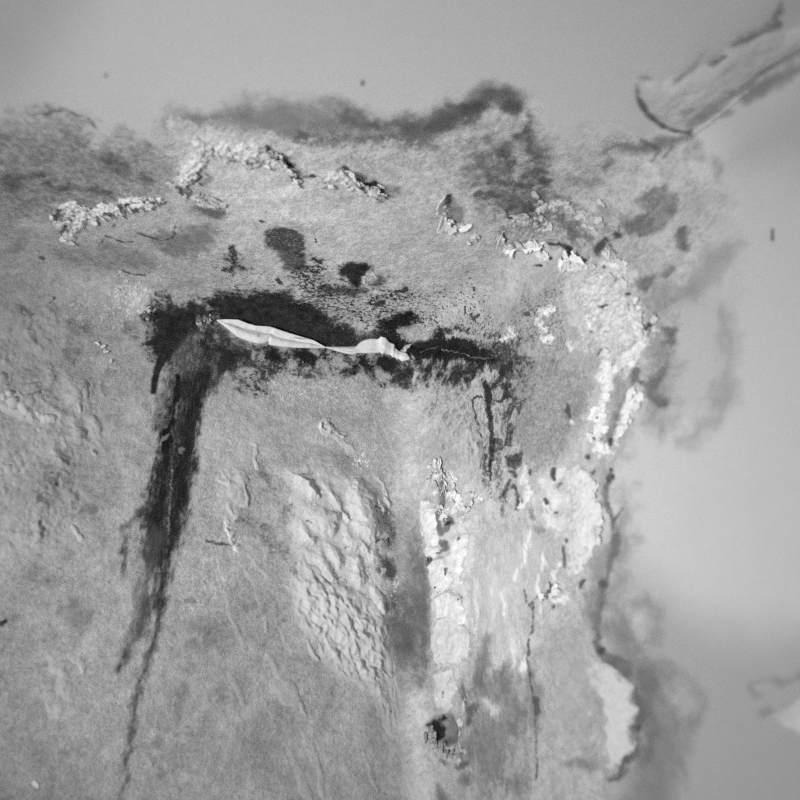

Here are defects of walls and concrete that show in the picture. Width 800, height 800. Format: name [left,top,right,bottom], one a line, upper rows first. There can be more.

peeling [49,192,165,246]
peeling [163,115,492,246]
water stain [431,87,521,130]
water stain [465,115,551,215]
peeling [496,186,622,274]
water stain [95,220,677,687]
peeling [517,464,604,608]
peeling [419,456,484,769]
water stain [123,685,142,764]
crack [523,589,541,780]
peeling [584,649,639,771]
water stain [609,693,650,781]